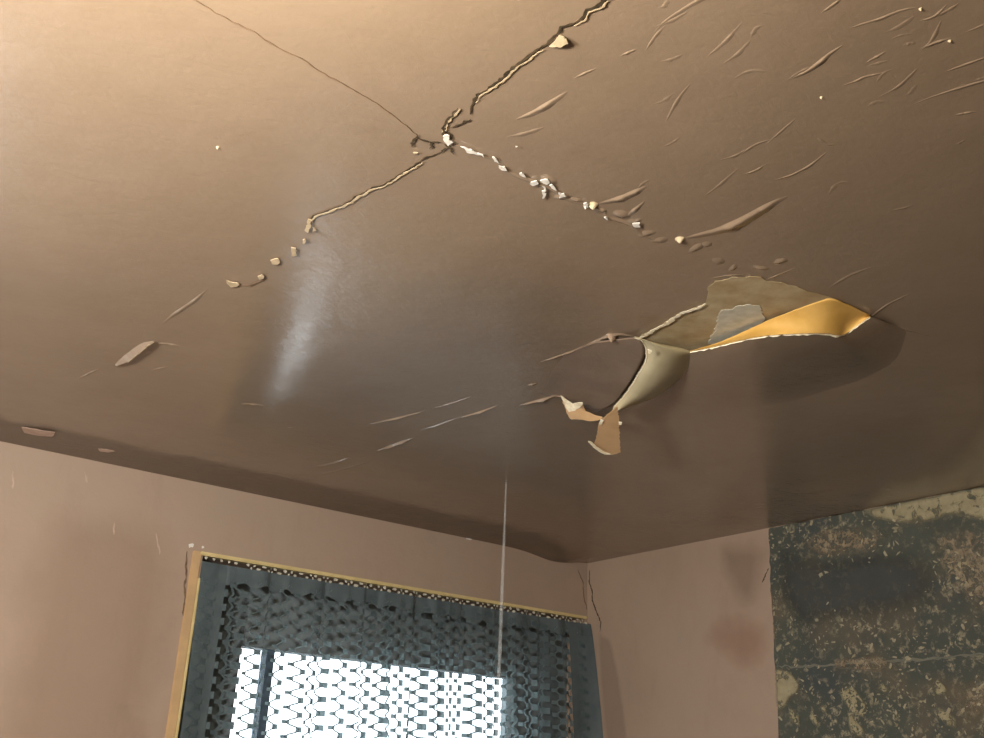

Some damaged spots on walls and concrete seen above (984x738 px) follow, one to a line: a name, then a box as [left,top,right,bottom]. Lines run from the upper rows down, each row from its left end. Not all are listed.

crack [163,0,608,323]
peeling [115,341,184,366]
leakage [768,486,984,738]